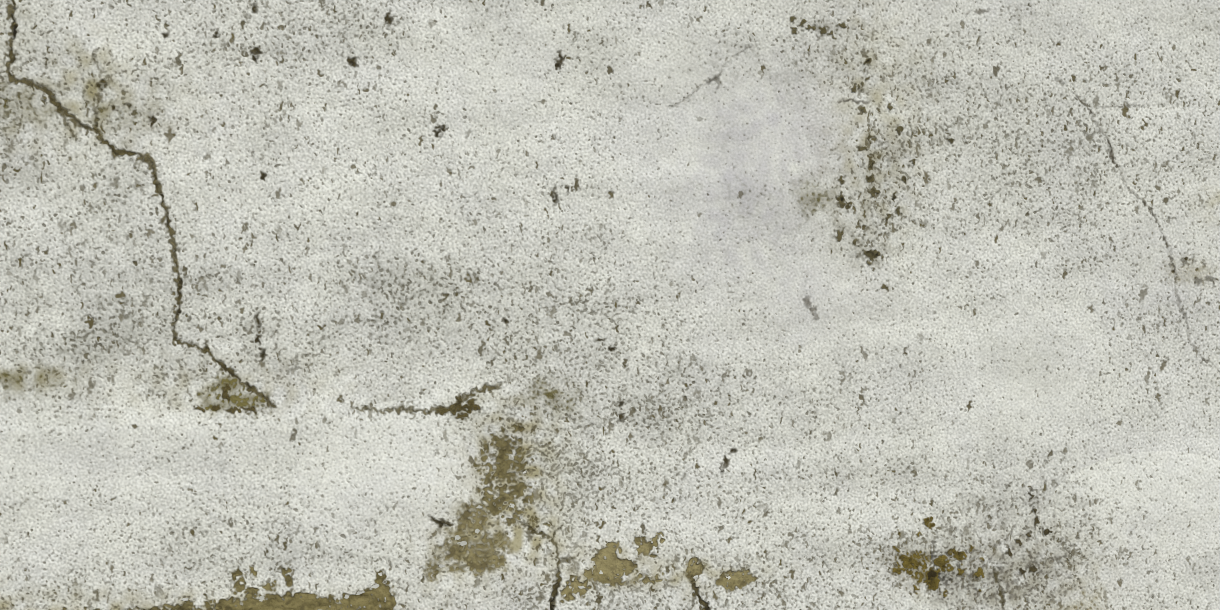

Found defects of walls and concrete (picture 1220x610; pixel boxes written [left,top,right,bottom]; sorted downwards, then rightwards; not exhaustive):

crack [4,0,276,408]
crack [356,383,501,415]
peeling [425,423,551,582]
peeling [128,566,396,610]
crack [521,522,574,610]
peeling [560,532,665,603]
peeling [686,557,706,581]
crack [690,575,710,610]
peeling [716,569,758,591]